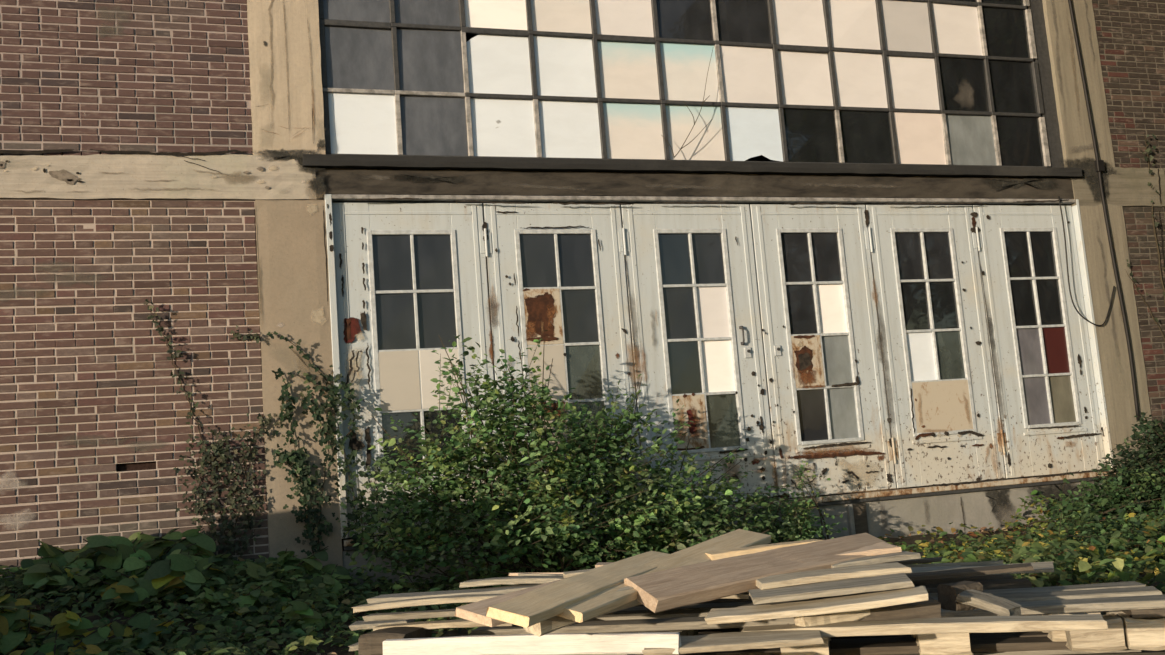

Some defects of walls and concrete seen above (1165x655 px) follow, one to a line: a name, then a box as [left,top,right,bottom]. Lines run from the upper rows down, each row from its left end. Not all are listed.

spalling [31,164,83,184]
water stain [260,140,327,198]
corrosion [523,288,559,342]
corrosion [718,253,896,503]
corrosion [907,251,1002,460]
corrosion [677,393,705,451]
spalling [746,414,774,455]
peeling [780,455,893,500]
corrosion [929,451,1011,486]
corrosion [1038,463,1093,479]